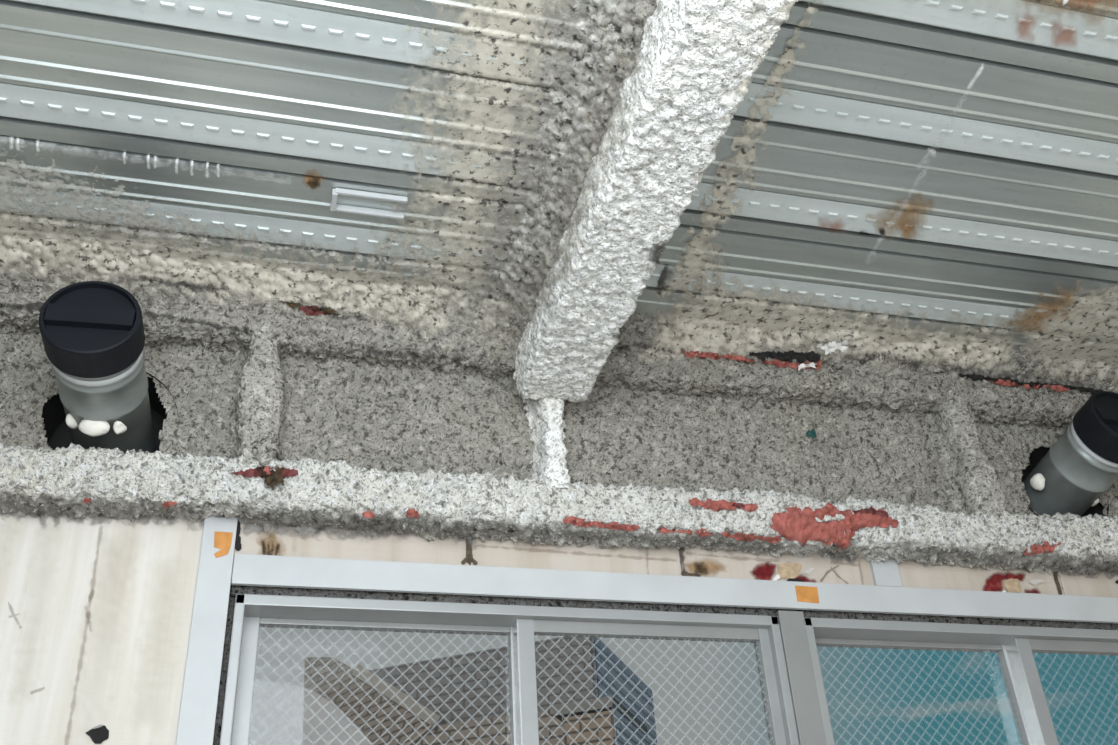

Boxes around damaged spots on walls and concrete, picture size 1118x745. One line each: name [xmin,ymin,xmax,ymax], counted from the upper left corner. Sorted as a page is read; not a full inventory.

corrosion [860,200,926,237]
spalling [682,340,849,371]
spalling [231,466,299,489]
spalling [689,498,759,512]
spalling [563,516,640,532]
spalling [658,503,899,550]
peeling [773,561,814,582]
peeling [1002,578,1045,593]